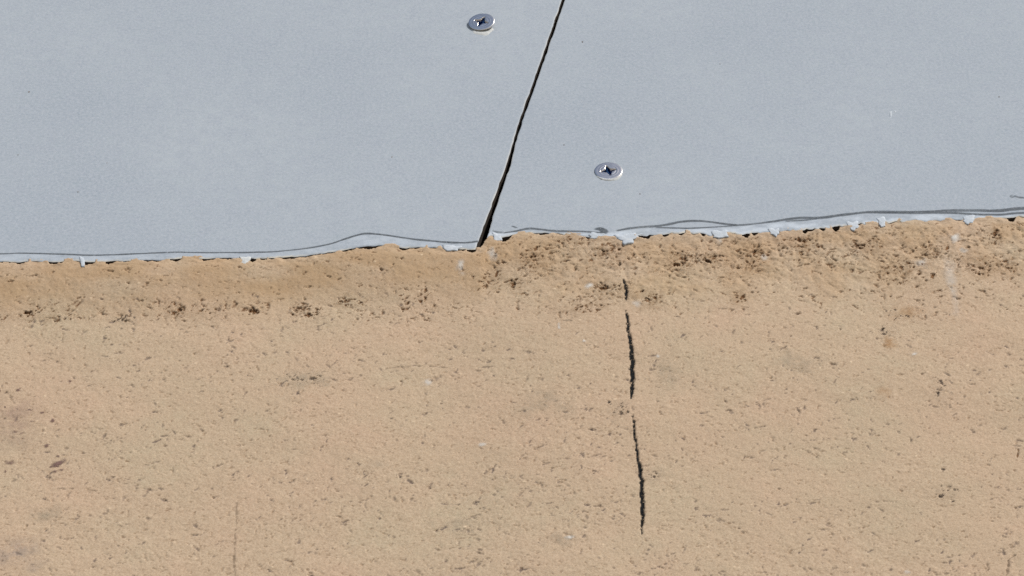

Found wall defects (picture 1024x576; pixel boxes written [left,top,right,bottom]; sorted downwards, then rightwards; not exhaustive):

crack [623,279,645,535]